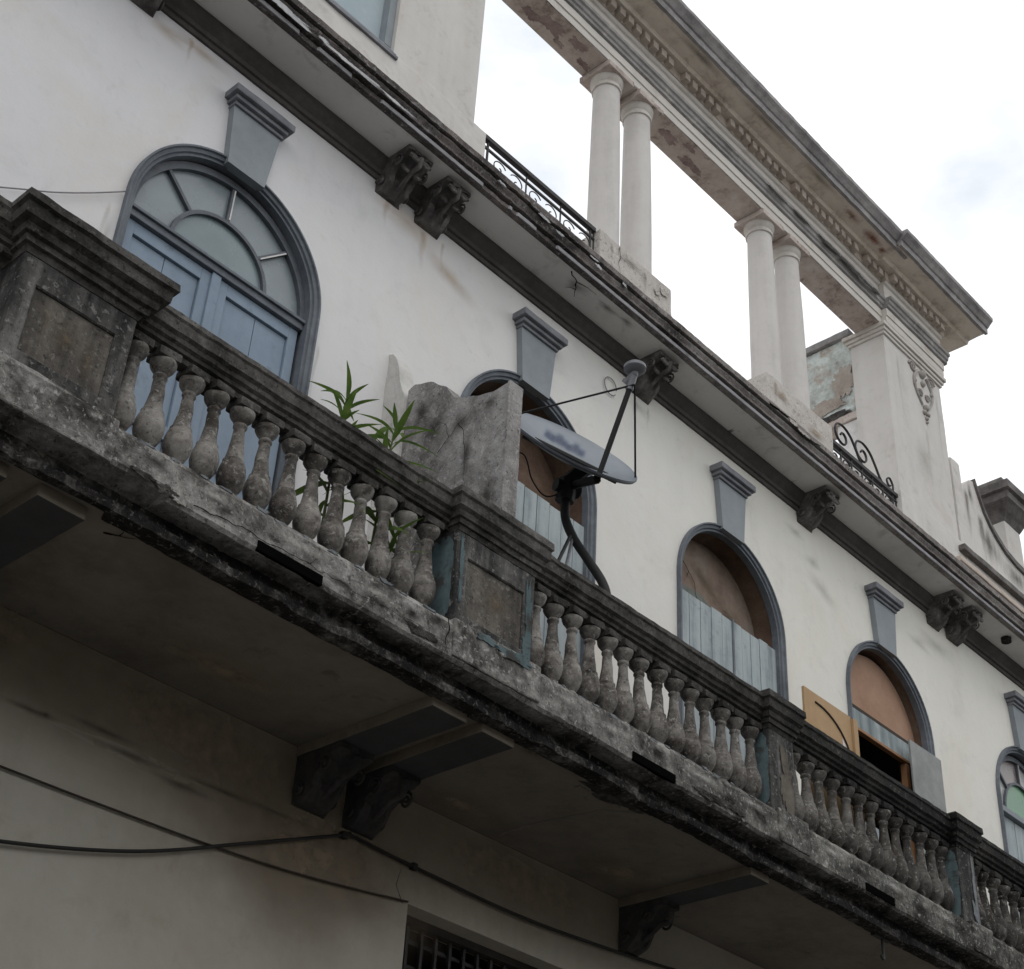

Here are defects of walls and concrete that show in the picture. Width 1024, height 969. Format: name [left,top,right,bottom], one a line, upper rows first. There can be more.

peeling [521,6,590,72]
peeling [658,129,701,177]
peeling [811,364,854,424]
crack [193,505,450,651]
peeling [423,534,465,616]
peeling [477,579,535,671]